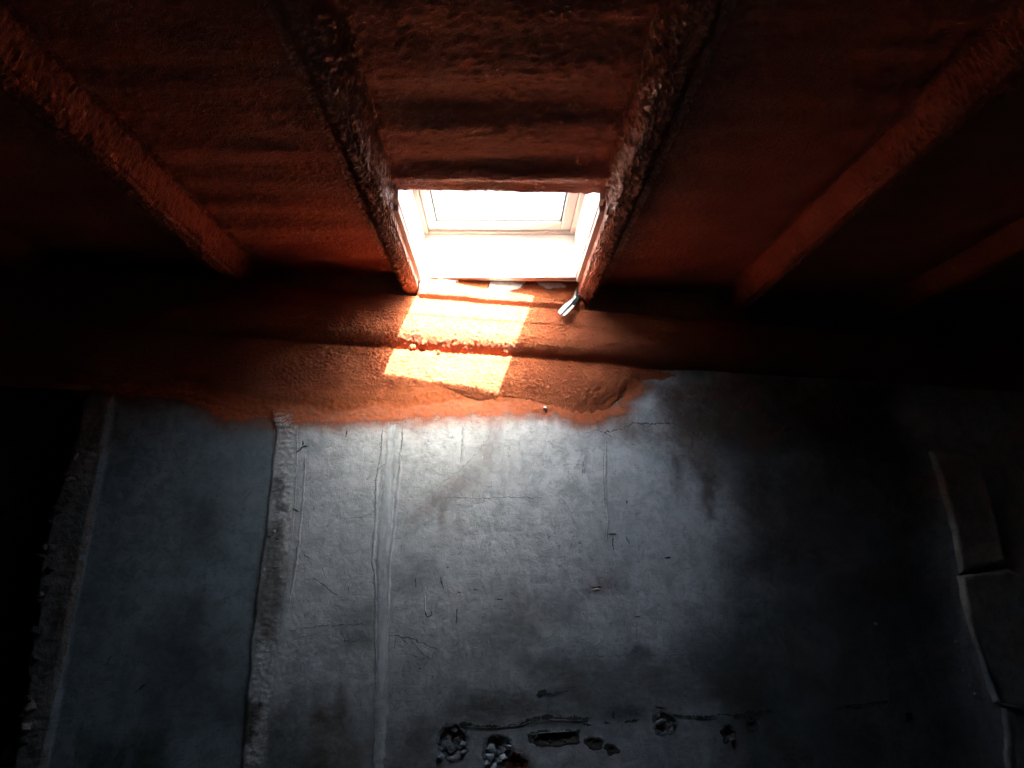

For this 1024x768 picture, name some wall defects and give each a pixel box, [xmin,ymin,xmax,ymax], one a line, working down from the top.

crack [582,422,680,548]
crack [290,550,438,660]
peeling [485,735,512,768]
crack [459,687,731,729]